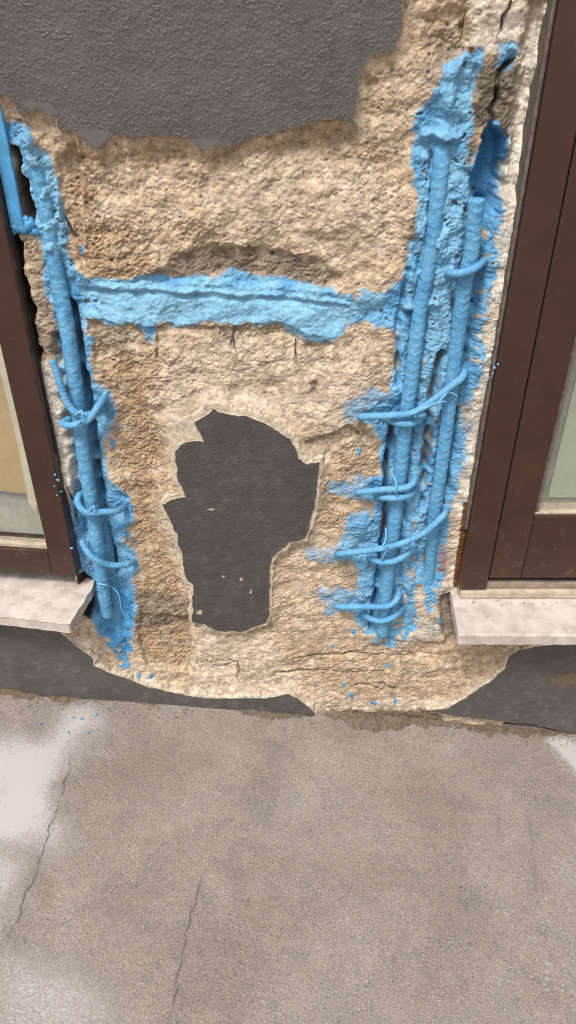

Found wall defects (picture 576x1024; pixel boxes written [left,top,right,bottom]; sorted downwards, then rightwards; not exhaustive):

crack [490,56,515,120]
crack [496,0,512,38]
spalling [0,0,547,728]
crack [5,758,70,945]
crack [169,878,202,1019]